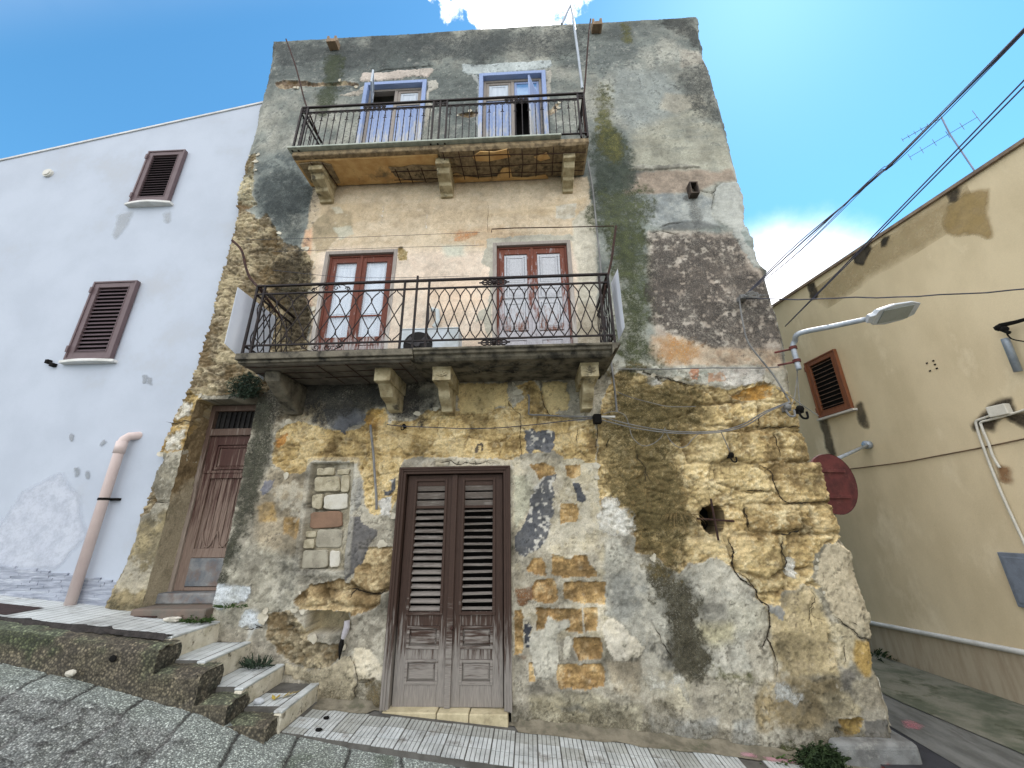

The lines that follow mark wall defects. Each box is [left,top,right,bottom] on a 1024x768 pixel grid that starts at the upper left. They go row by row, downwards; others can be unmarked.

water stain [255,167,315,348]
spalling [157,152,418,458]
spalling [388,147,586,184]
water stain [587,129,638,199]
water stain [619,291,647,356]
water stain [808,188,991,300]
spalling [257,369,841,689]
crack [728,419,827,676]
water stain [513,564,711,737]